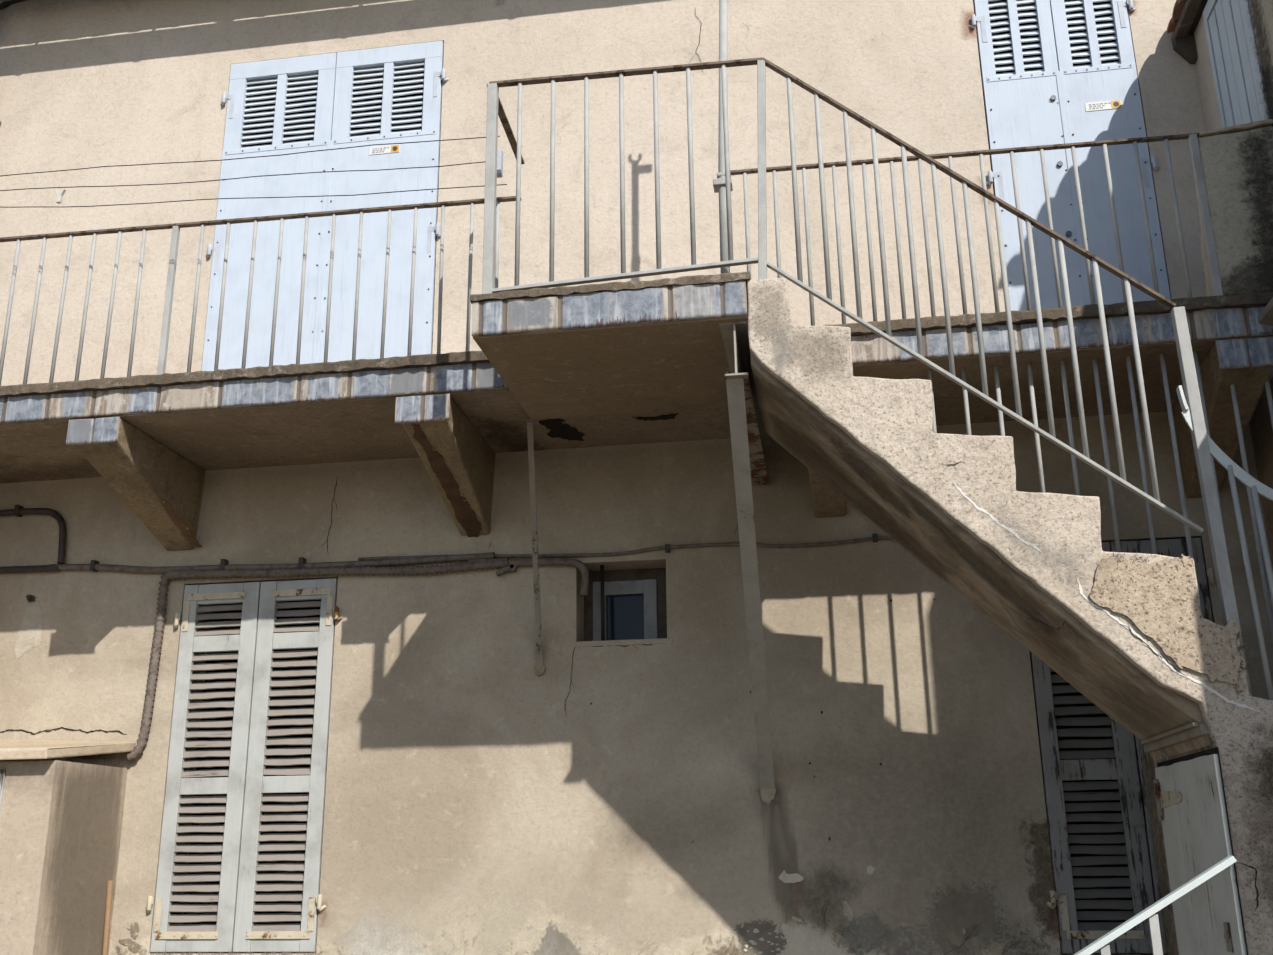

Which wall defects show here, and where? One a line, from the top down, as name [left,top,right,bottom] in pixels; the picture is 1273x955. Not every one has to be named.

damp [1221,0,1273,295]
crack [322,477,338,552]
crack [939,460,1043,554]
crack [565,644,652,716]
crack [994,578,1261,712]
crack [0,727,125,735]
flaking render [119,921,141,953]